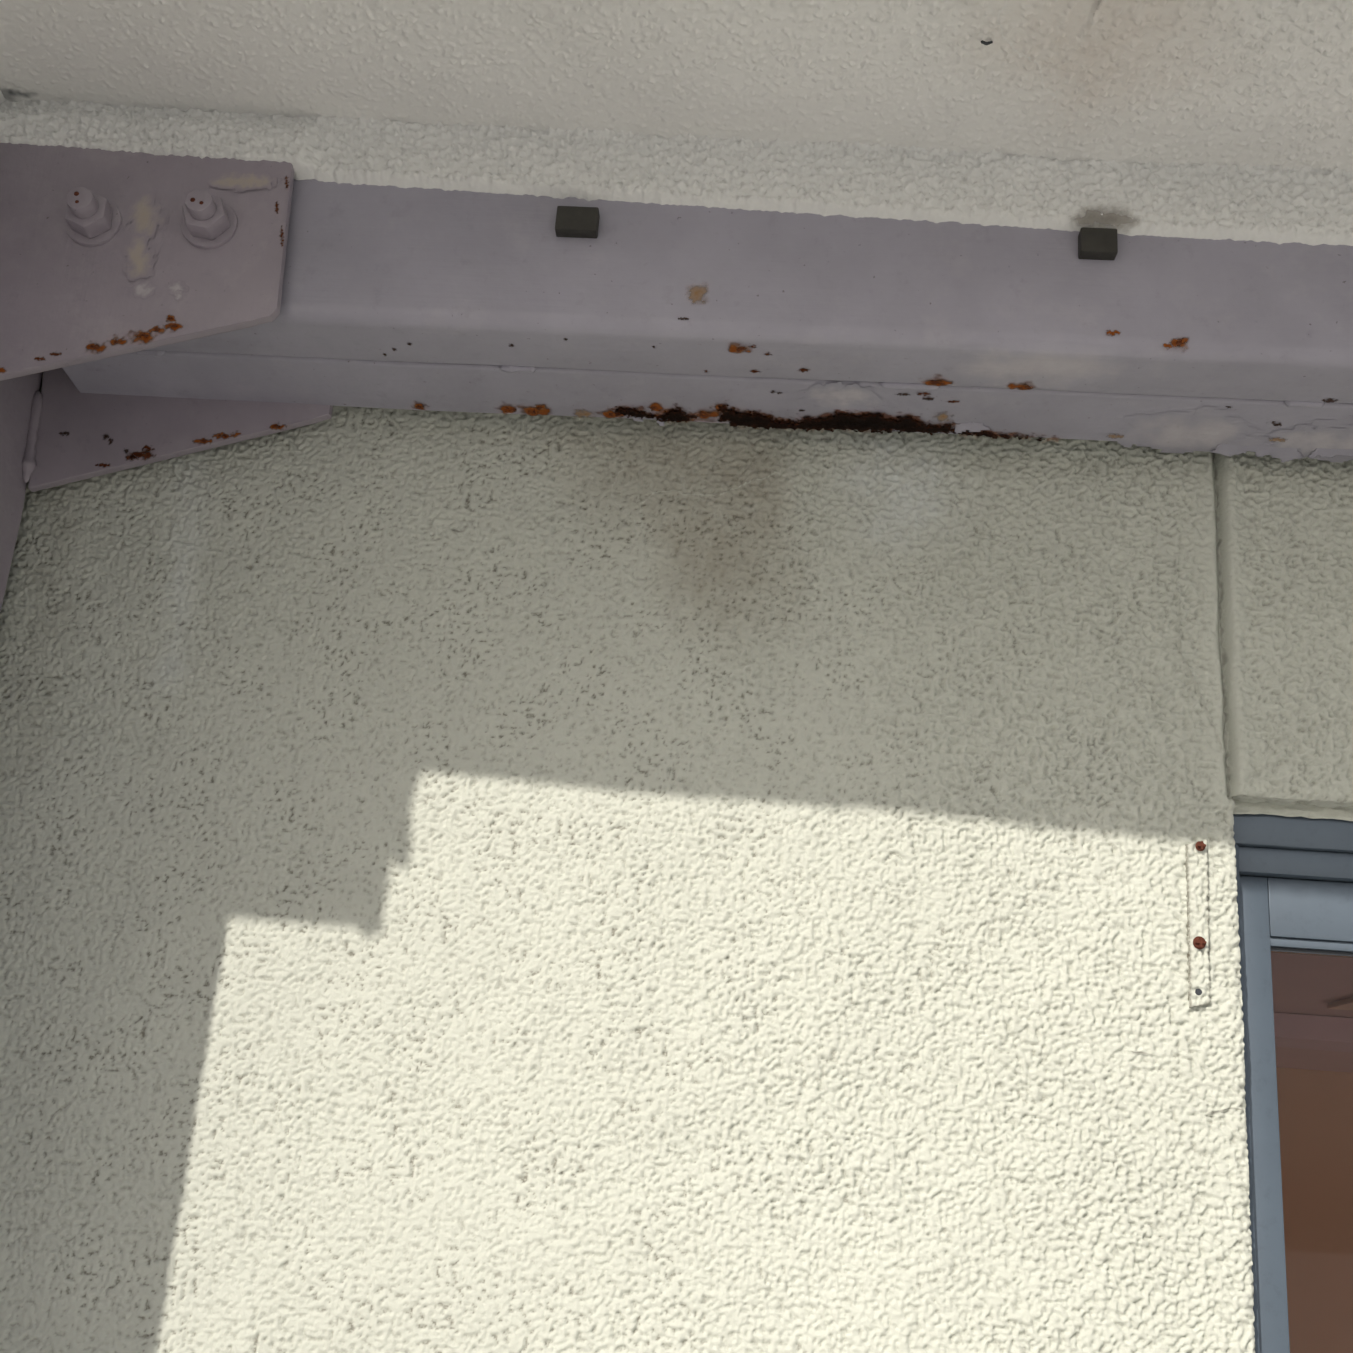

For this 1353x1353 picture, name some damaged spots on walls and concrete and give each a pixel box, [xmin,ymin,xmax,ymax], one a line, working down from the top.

rust [689,286,707,303]
rust [86,315,183,353]
rust [729,344,772,356]
rust [1163,338,1189,348]
rust [575,379,1058,441]
rust [193,432,241,444]
rust [125,445,156,460]